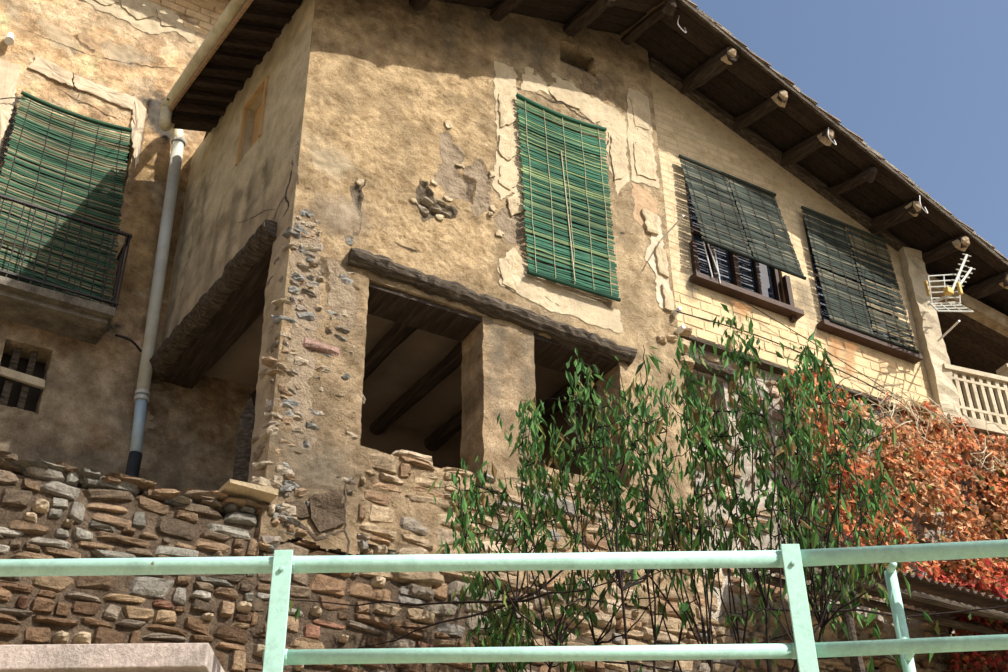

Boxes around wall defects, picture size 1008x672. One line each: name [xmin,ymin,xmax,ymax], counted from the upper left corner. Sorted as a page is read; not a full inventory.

crack [27,30,177,120]
crack [238,133,300,225]
peeling [408,61,674,333]
peeling [285,490,345,533]